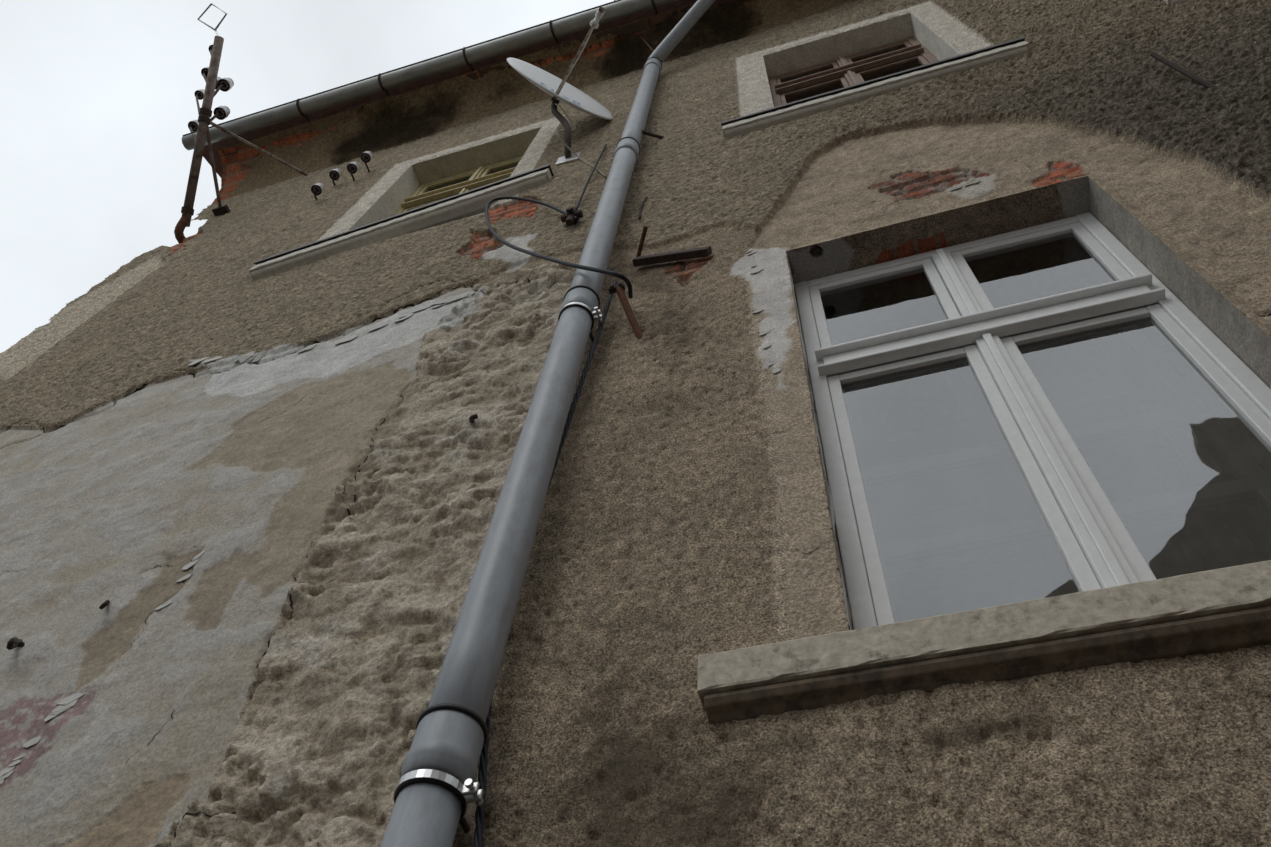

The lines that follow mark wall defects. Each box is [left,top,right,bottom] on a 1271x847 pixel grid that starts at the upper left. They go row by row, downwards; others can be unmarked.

flaking render [211,150,252,205]
flaking render [868,165,999,202]
peeling [1031,161,1090,218]
flaking render [164,230,203,259]
peeling [455,196,542,272]
peeling [0,286,488,794]
peeling [52,772,190,847]